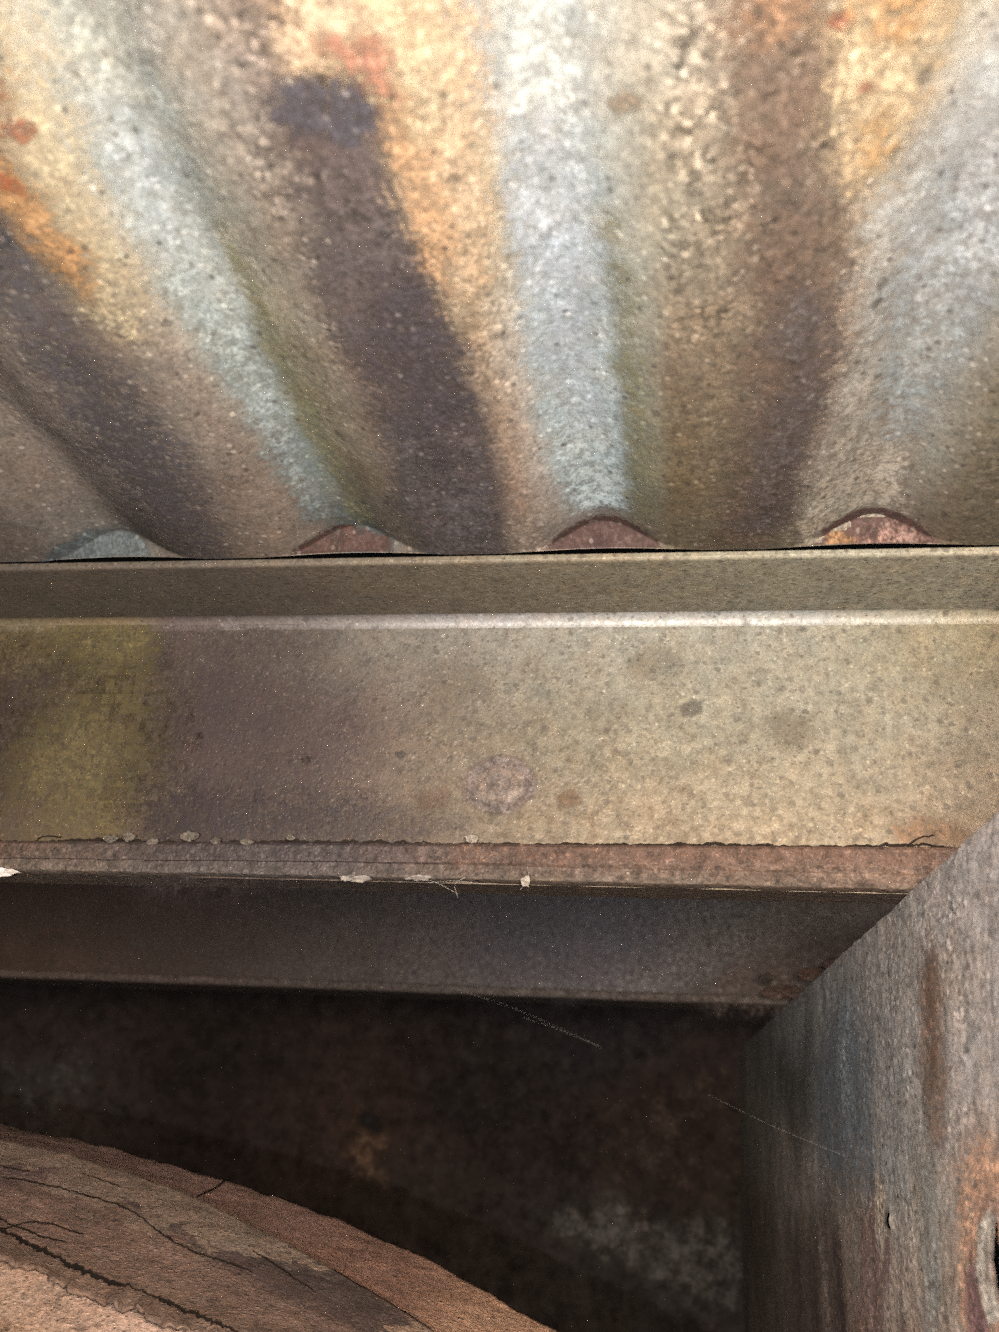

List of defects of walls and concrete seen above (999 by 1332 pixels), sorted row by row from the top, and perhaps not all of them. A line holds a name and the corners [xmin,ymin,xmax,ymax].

corrosion [0,69,97,300]
leakage [0,0,507,559]
leakage [796,23,999,545]
corrosion [453,816,964,865]
corrosion [917,935,947,1152]
crack [0,1217,239,1332]
crack [0,1165,316,1292]
corrosion [857,1173,890,1332]
corrosion [955,1131,999,1332]